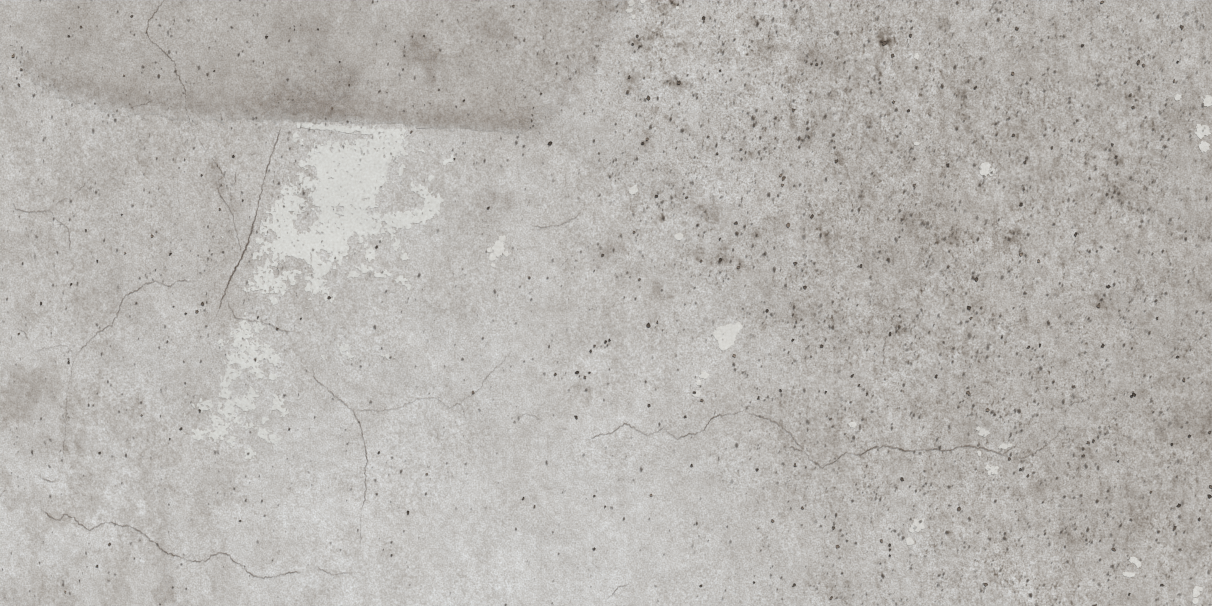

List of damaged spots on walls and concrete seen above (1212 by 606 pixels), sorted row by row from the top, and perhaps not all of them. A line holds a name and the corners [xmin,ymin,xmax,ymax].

peeling [242,123,452,310]
peeling [184,313,299,459]